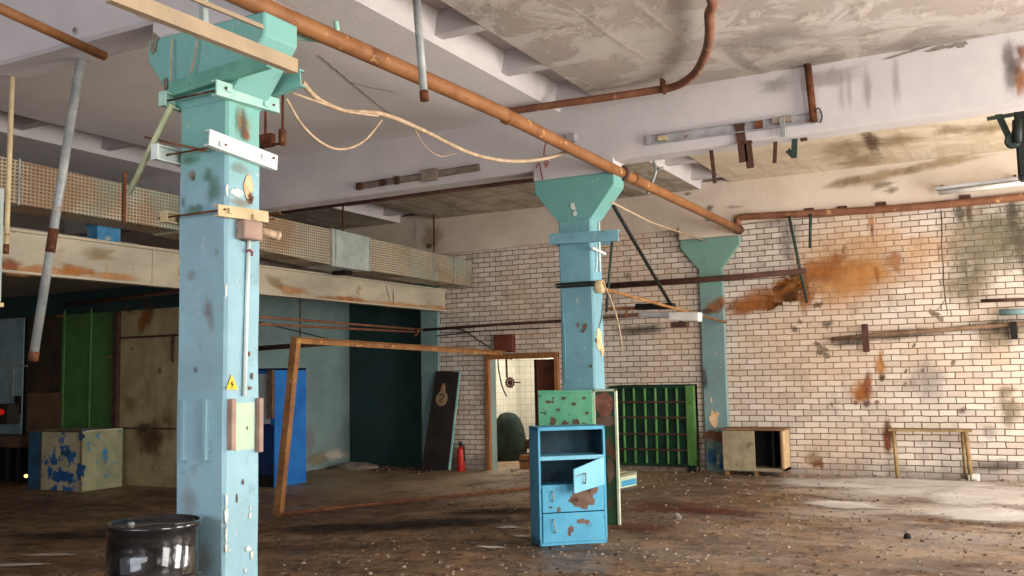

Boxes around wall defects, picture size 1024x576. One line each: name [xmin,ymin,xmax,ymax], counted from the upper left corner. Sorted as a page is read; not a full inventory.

rust [239,110,249,140]
leakage [865,132,878,150]
rust [2,259,36,274]
rust [52,265,131,280]
rust [703,256,879,313]
peeling [577,323,604,356]
rust [853,351,885,406]
peeling [703,397,723,464]
rust [883,421,892,450]